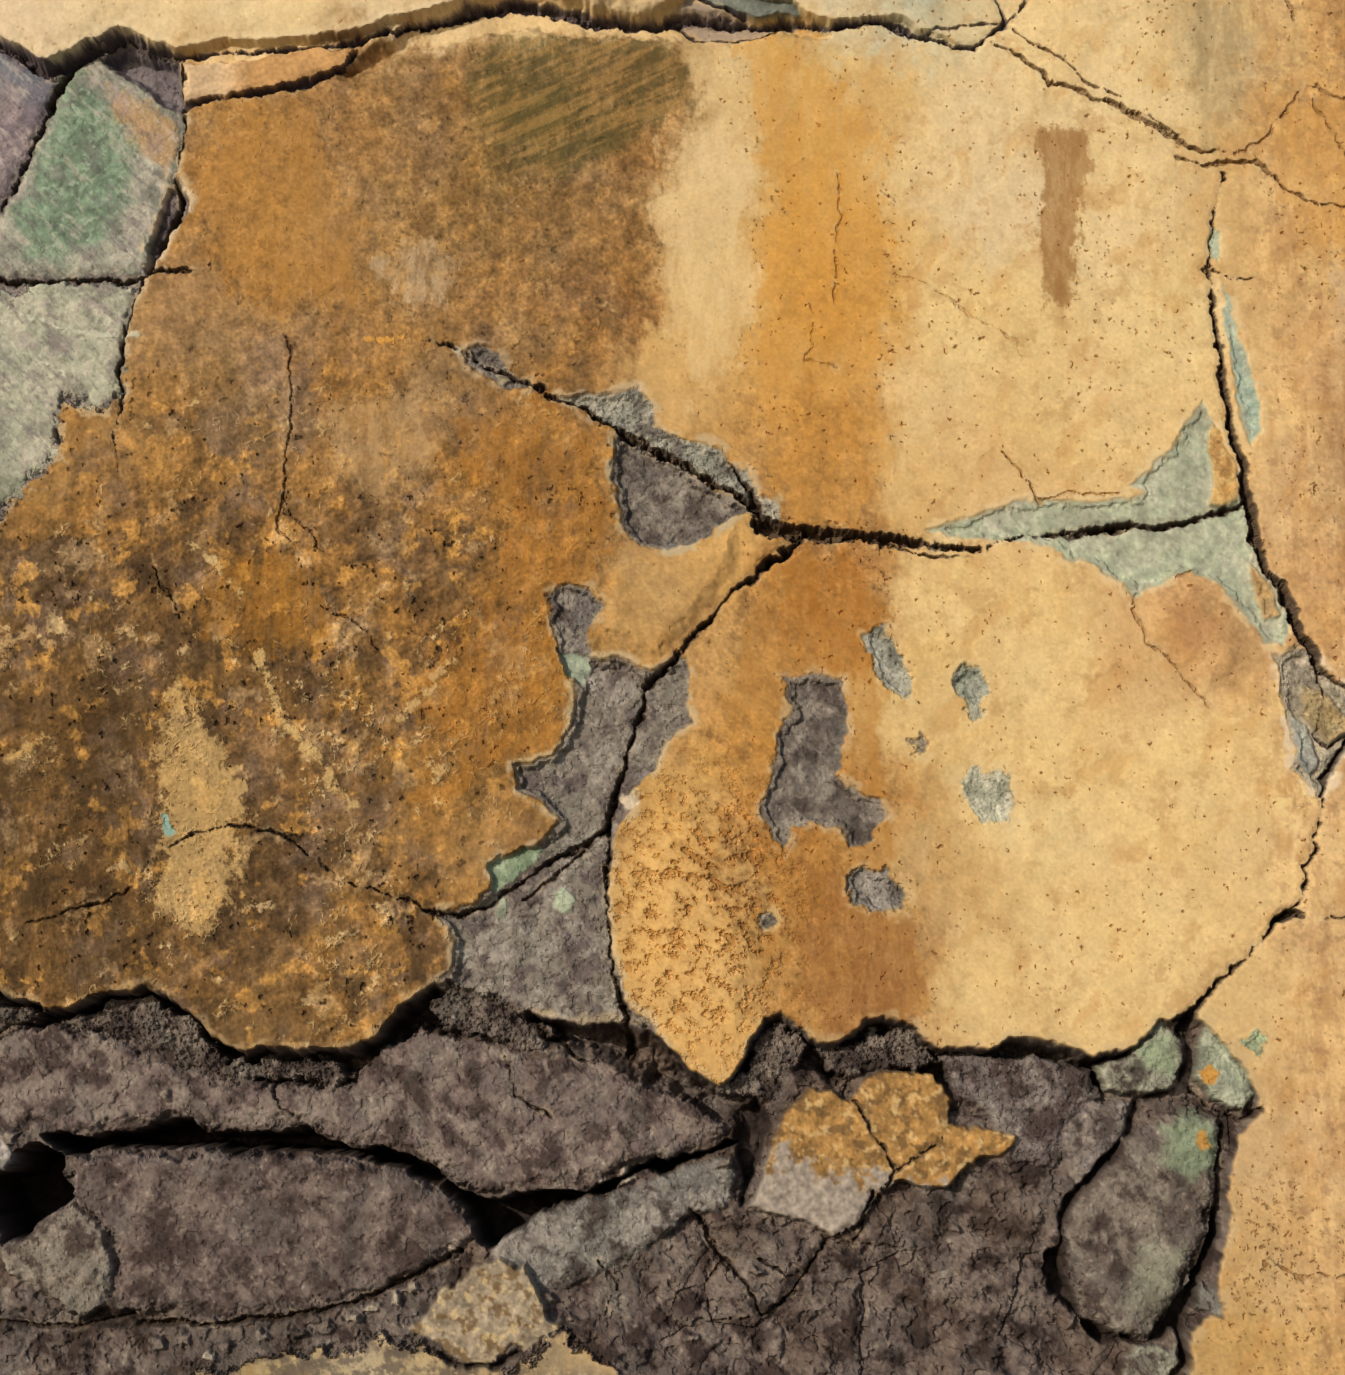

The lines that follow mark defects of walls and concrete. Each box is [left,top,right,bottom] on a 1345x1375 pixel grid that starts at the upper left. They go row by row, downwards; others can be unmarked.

spalling [0,47,190,522]
crack [0,0,1345,1065]
peeling [924,227,1345,798]
spalling [0,580,1272,1375]
crack [1169,1362,1190,1375]